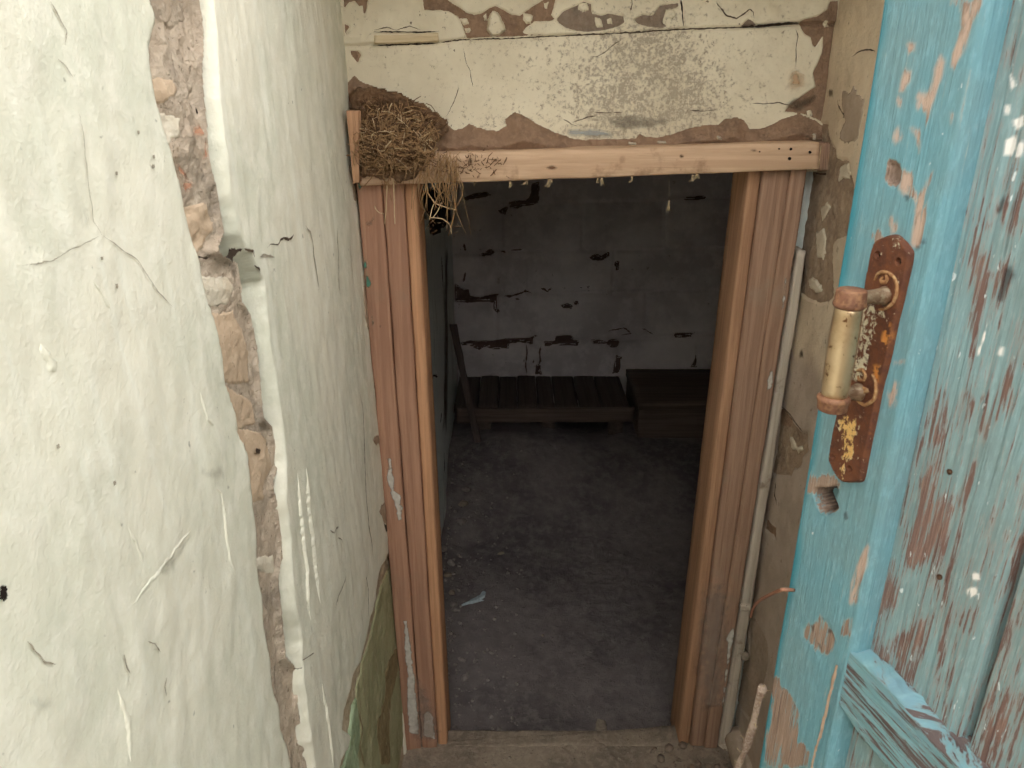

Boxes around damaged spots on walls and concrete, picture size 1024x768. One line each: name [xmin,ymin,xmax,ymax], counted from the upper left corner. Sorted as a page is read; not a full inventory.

peeling [344,0,368,13]
peeling [423,0,678,38]
flaking render [785,1,865,303]
crack [28,115,168,302]
peeling [499,182,540,215]
crack [198,228,339,287]
peeling [455,284,500,313]
peeling [461,335,579,350]
peeling [592,339,622,374]
flaking render [148,0,307,768]
flaking render [773,409,809,476]